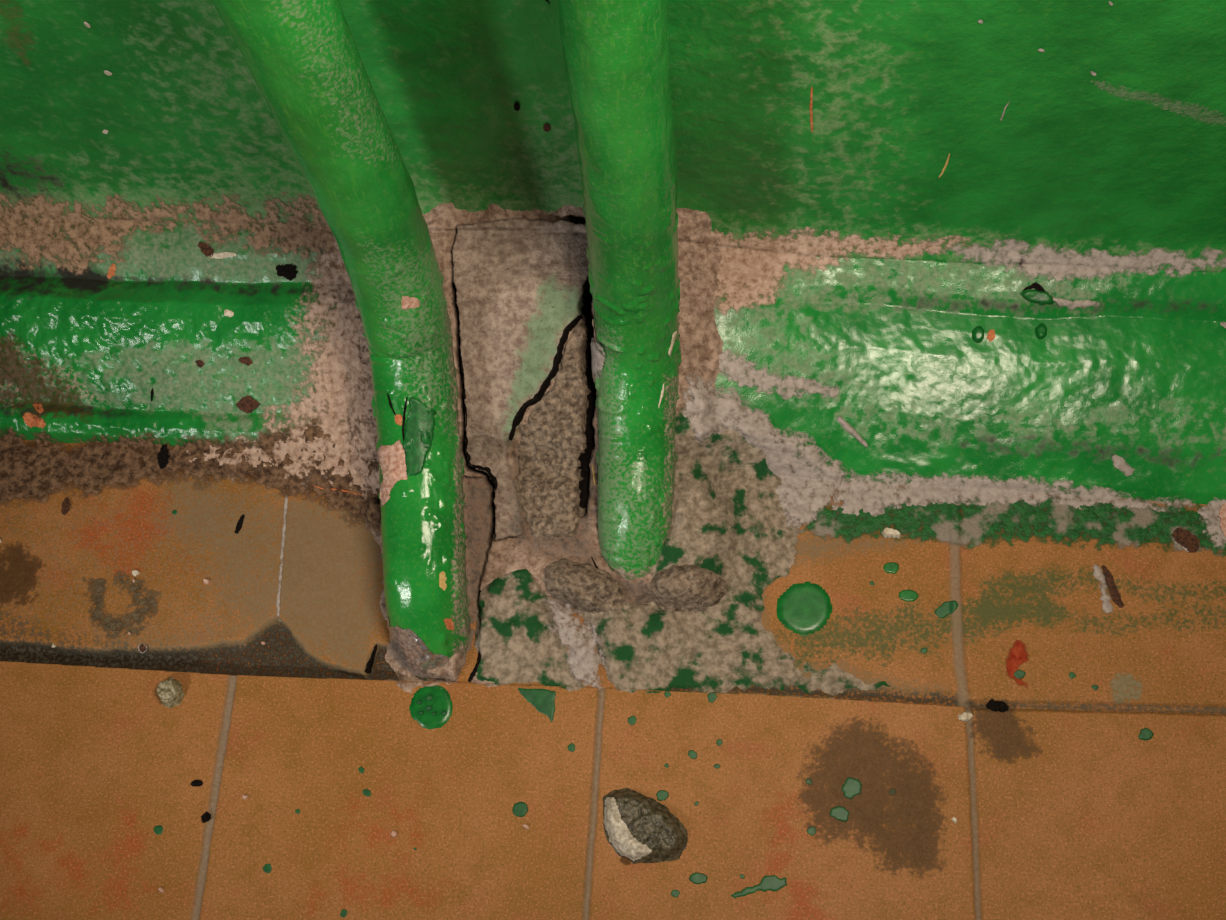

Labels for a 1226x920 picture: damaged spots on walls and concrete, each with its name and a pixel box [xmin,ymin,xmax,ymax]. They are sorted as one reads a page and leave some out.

damp [0,545,41,605]
peeling [23,403,46,429]
damp [83,572,159,639]
peeling [198,242,237,259]
spalling [236,214,436,506]
crack [468,651,481,682]
crack [456,296,498,539]
crack [509,284,597,508]
spalling [516,319,596,538]
spalling [649,406,803,602]
peeling [1019,282,1099,310]
damp [801,719,942,870]